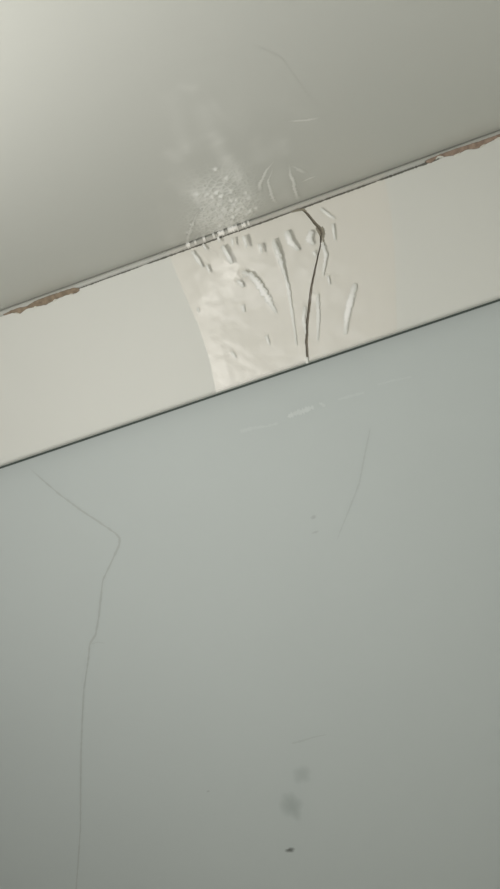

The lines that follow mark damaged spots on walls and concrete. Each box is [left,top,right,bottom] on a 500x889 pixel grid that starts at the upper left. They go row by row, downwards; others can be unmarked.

peeling [425,134,500,163]
peeling [3,288,79,315]
crack [79,159,439,358]
crack [27,466,121,889]